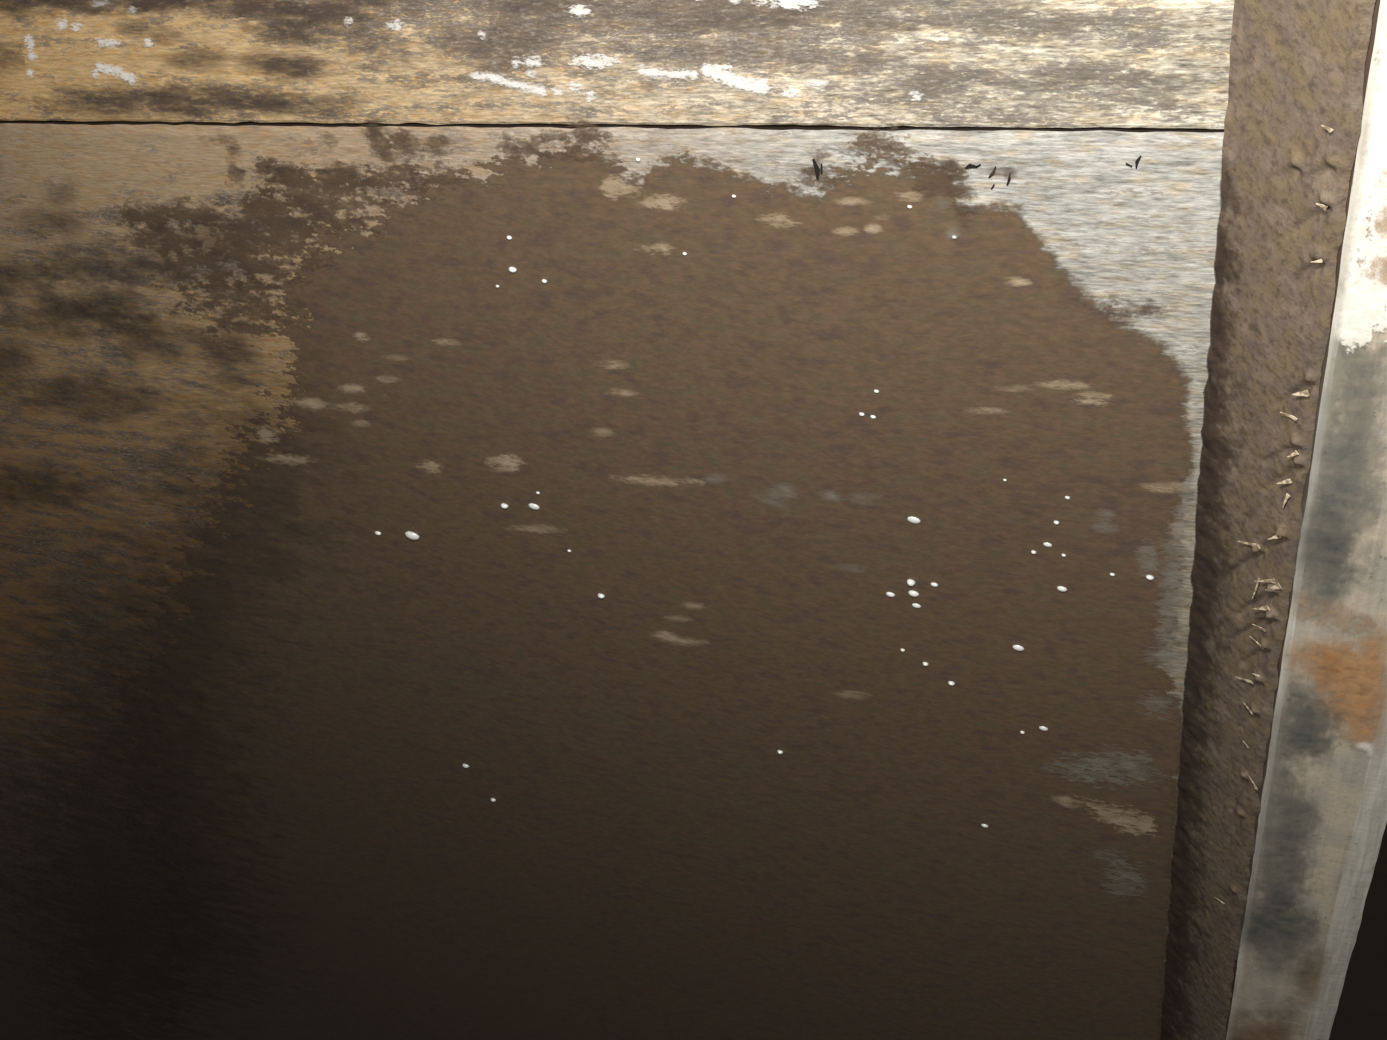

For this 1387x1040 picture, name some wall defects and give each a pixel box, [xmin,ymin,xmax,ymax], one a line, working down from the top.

leakage [0,0,91,11]
leakage [134,0,381,40]
leakage [252,58,319,76]
leakage [70,86,332,115]
crack [812,159,823,180]
leakage [1171,0,1381,1040]
leakage [92,120,1233,1040]
corrosion [1311,638,1383,743]